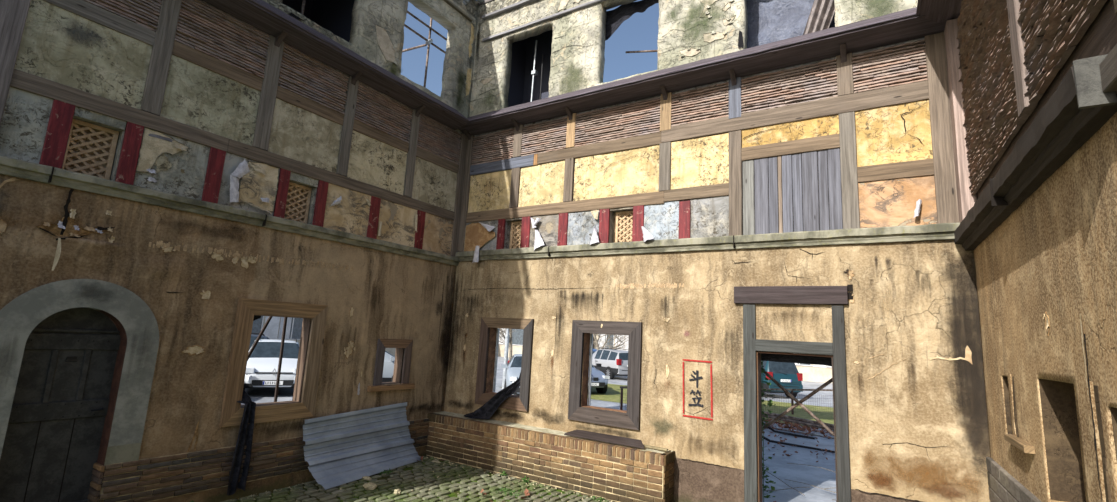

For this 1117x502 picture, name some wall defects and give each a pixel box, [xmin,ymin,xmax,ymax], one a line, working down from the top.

leakage [443,0,606,44]
spalling [36,209,115,243]
spalling [211,252,256,269]
leakage [439,277,458,373]
spalling [181,345,206,356]